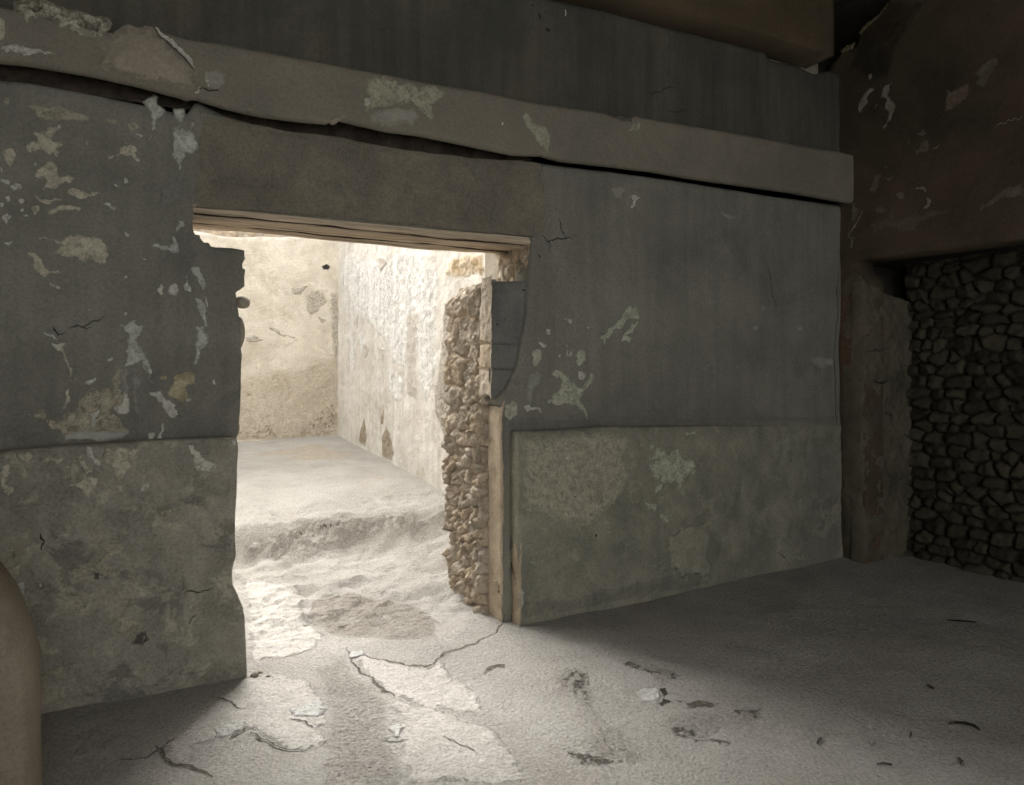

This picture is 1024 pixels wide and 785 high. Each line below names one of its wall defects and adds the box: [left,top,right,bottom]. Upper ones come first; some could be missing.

flaking render [0,104,116,224]
flaking render [107,118,143,162]
flaking render [28,234,109,289]
flaking render [157,267,206,296]
crack [543,219,572,252]
crack [69,316,107,329]
flaking render [600,305,640,344]
flaking render [27,327,195,497]
flaking render [520,344,629,527]
flaking render [645,443,711,581]
crack [346,622,503,697]
crack [117,738,213,777]